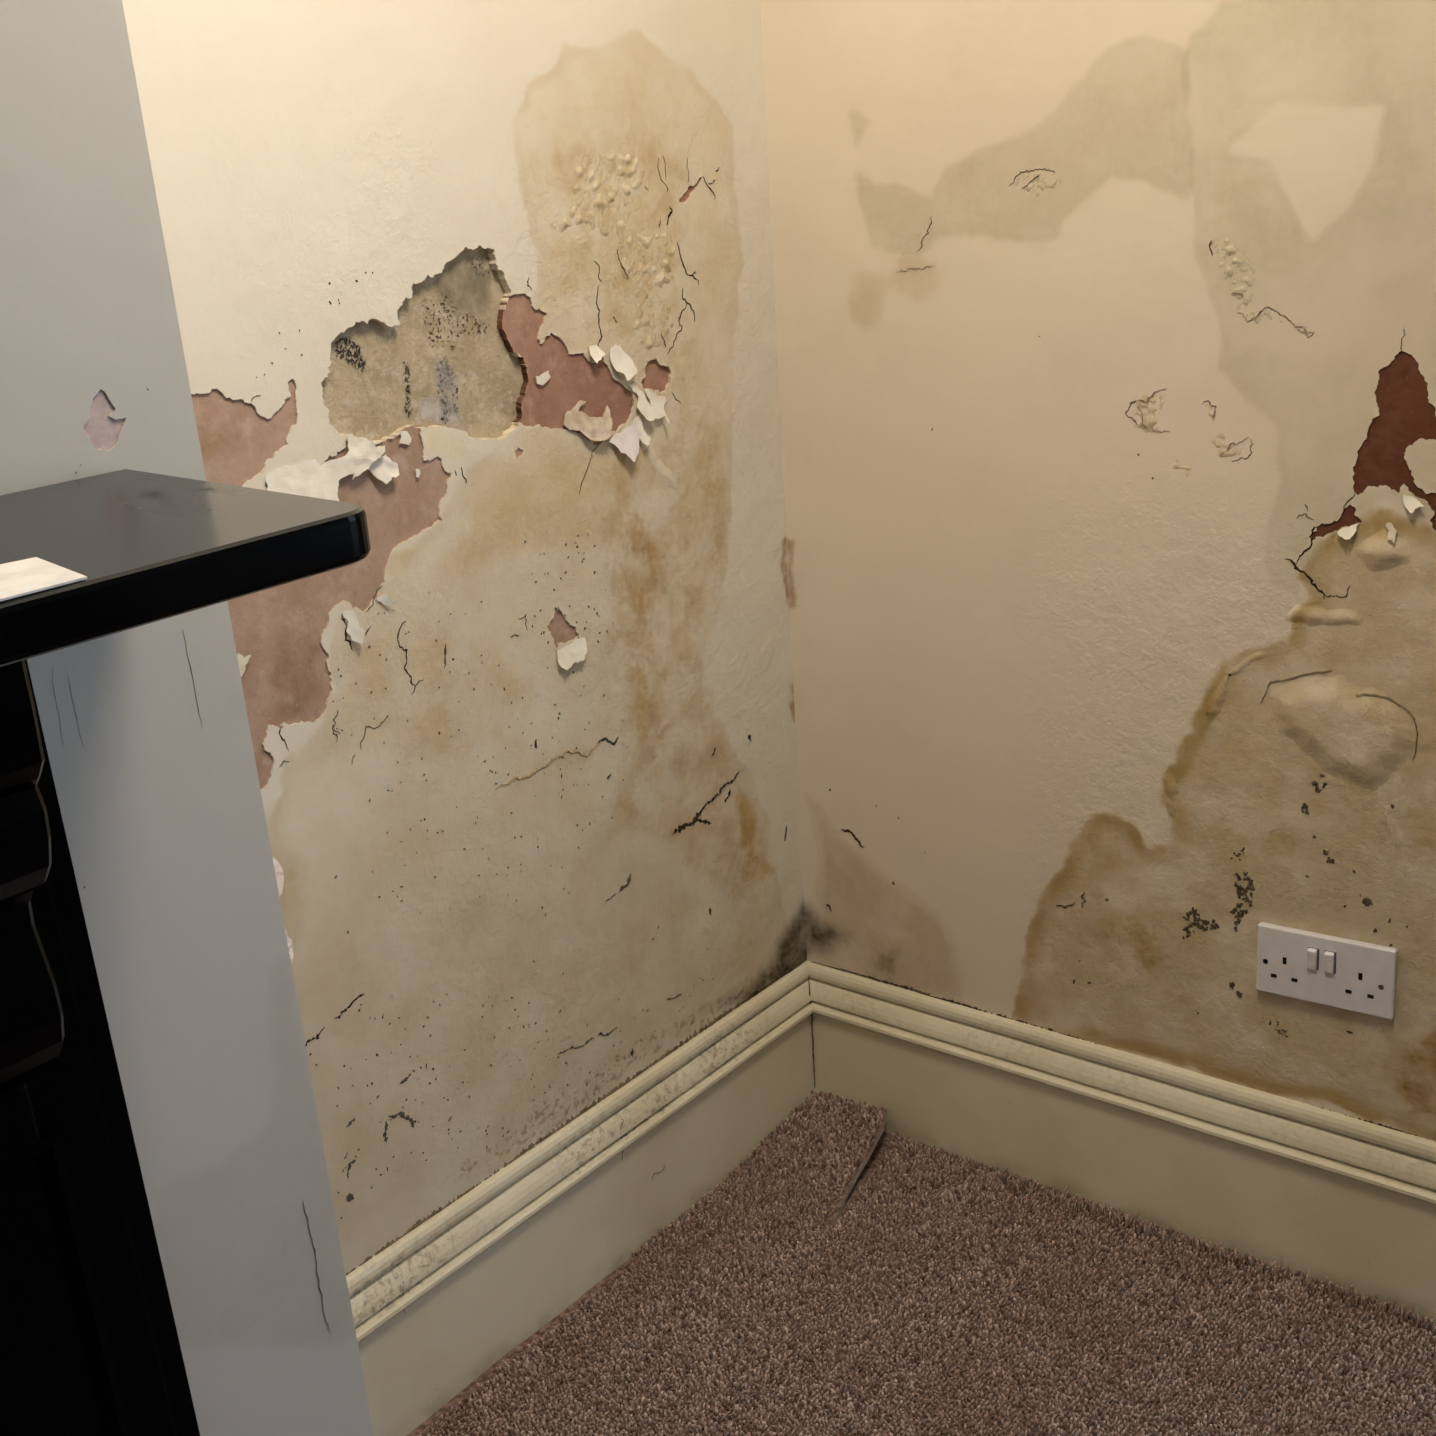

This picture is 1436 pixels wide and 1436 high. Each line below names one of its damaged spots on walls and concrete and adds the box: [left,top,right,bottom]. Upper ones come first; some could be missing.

crack [645,156,719,354]
peeling [84,390,125,451]
peeling [191,150,675,789]
peeling [1312,351,1436,544]
crack [495,744,598,790]
damp [673,772,740,834]
crack [1261,670,1331,702]
crack [1355,693,1418,759]
peeling [272,856,284,909]
mould [1183,847,1255,939]
damp [755,912,831,994]
damp [337,1003,470,1189]